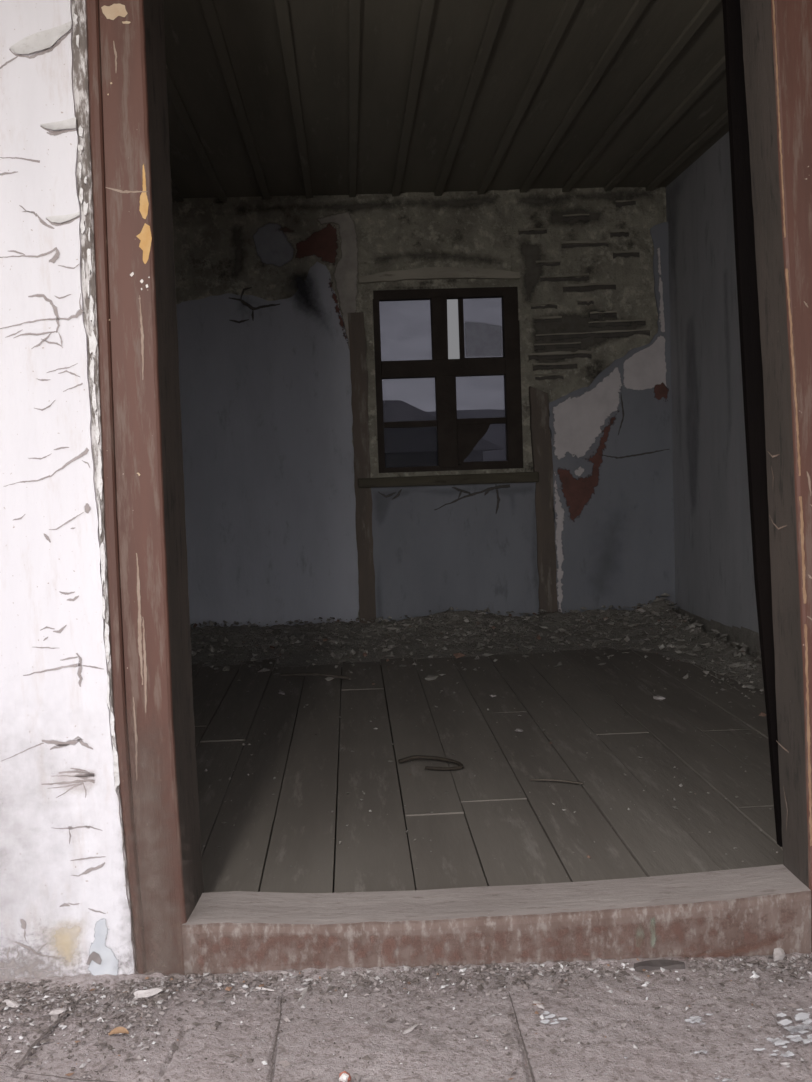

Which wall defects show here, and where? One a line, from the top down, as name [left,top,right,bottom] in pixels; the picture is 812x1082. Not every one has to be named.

peeling [101,3,130,24]
crack [0,157,40,175]
peeling [105,164,152,264]
crack [0,205,83,410]
peeling [130,272,150,380]
flaking render [172,187,669,612]
crack [7,447,90,486]
crack [44,503,90,542]
crack [23,591,102,687]
peeling [133,553,147,781]
crack [2,737,95,798]
flaking render [87,919,119,976]